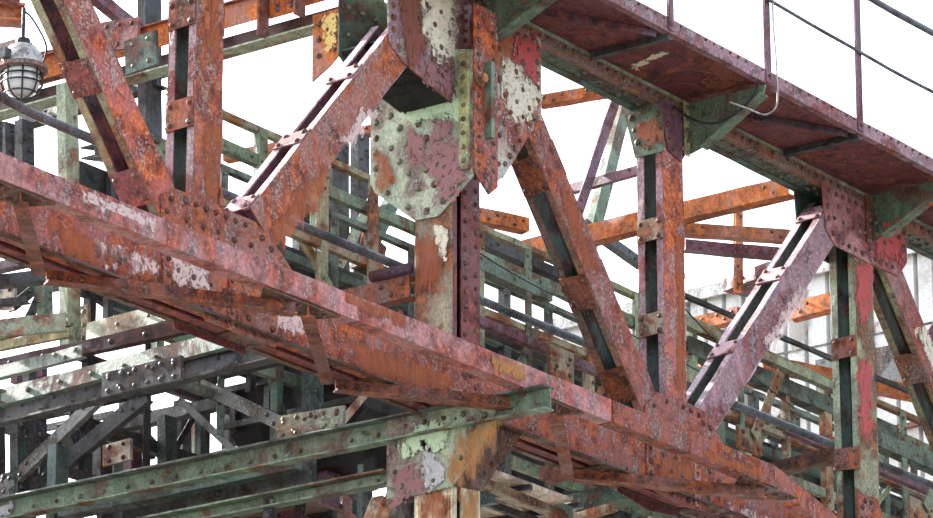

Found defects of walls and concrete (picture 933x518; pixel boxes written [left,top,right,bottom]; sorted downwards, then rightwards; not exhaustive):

peeling [404,0,475,207]
peeling [499,34,542,135]
rust [345,292,406,328]
rust [675,236,689,397]
peeling [914,326,933,370]
peeling [387,419,448,509]
rust [418,415,497,518]